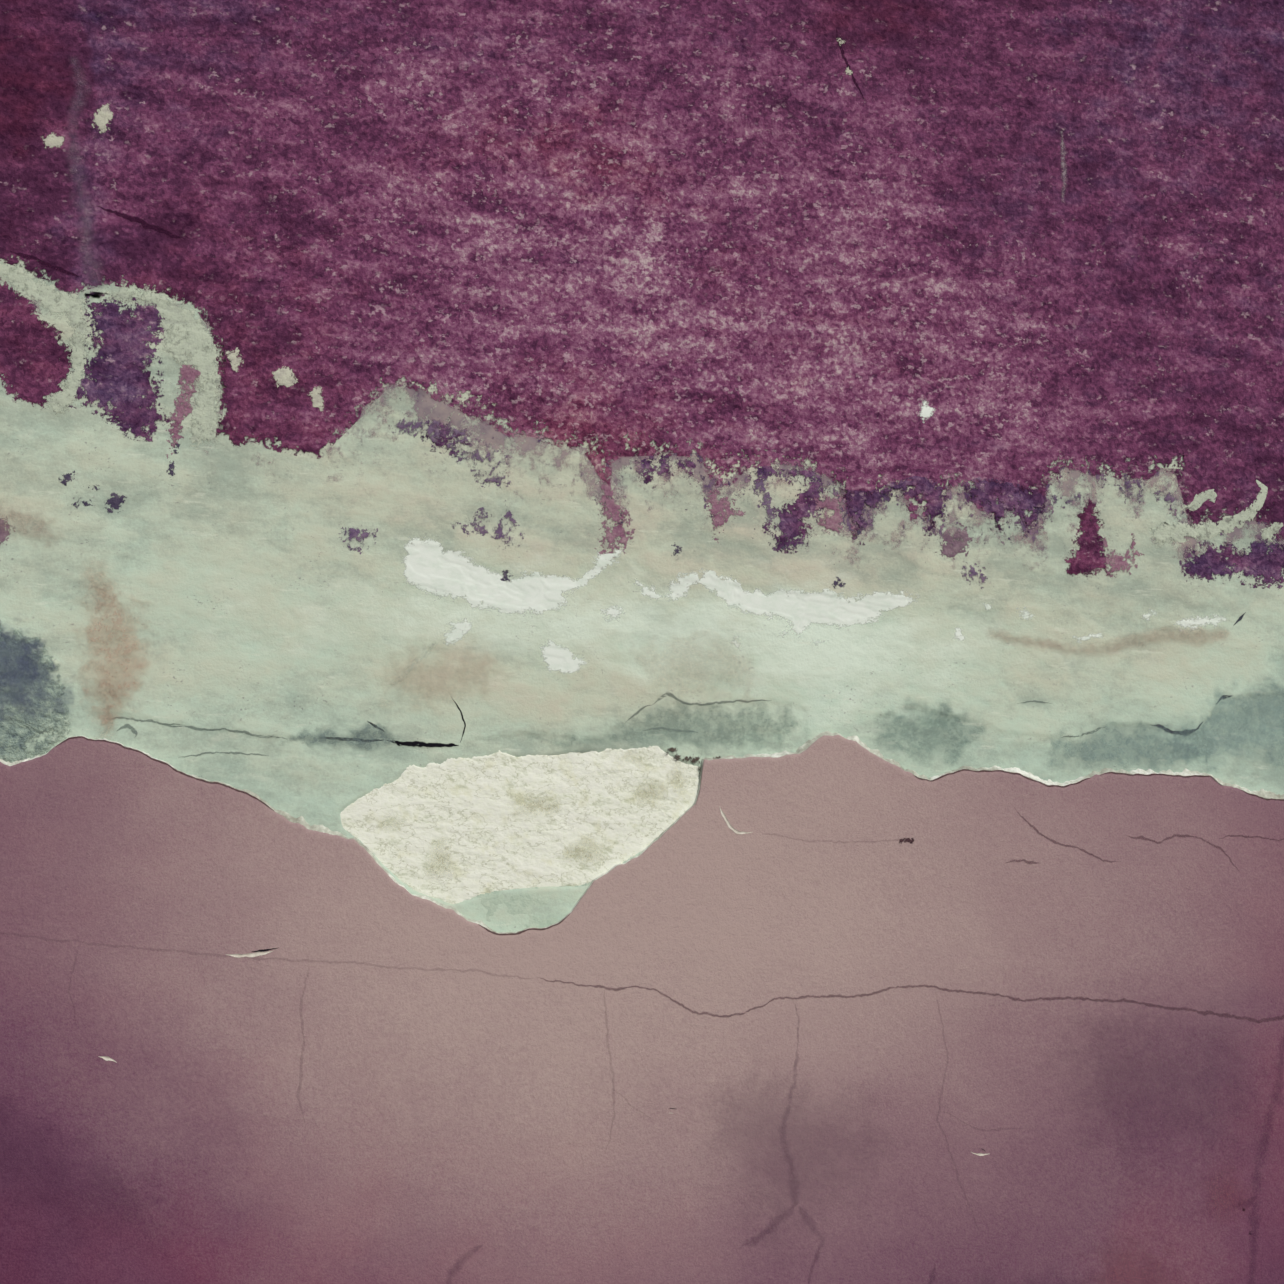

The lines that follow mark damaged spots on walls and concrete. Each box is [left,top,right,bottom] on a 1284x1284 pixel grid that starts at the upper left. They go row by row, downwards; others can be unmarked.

peeling [0,255,1284,934]
crack [326,696,466,747]
crack [1151,695,1231,736]